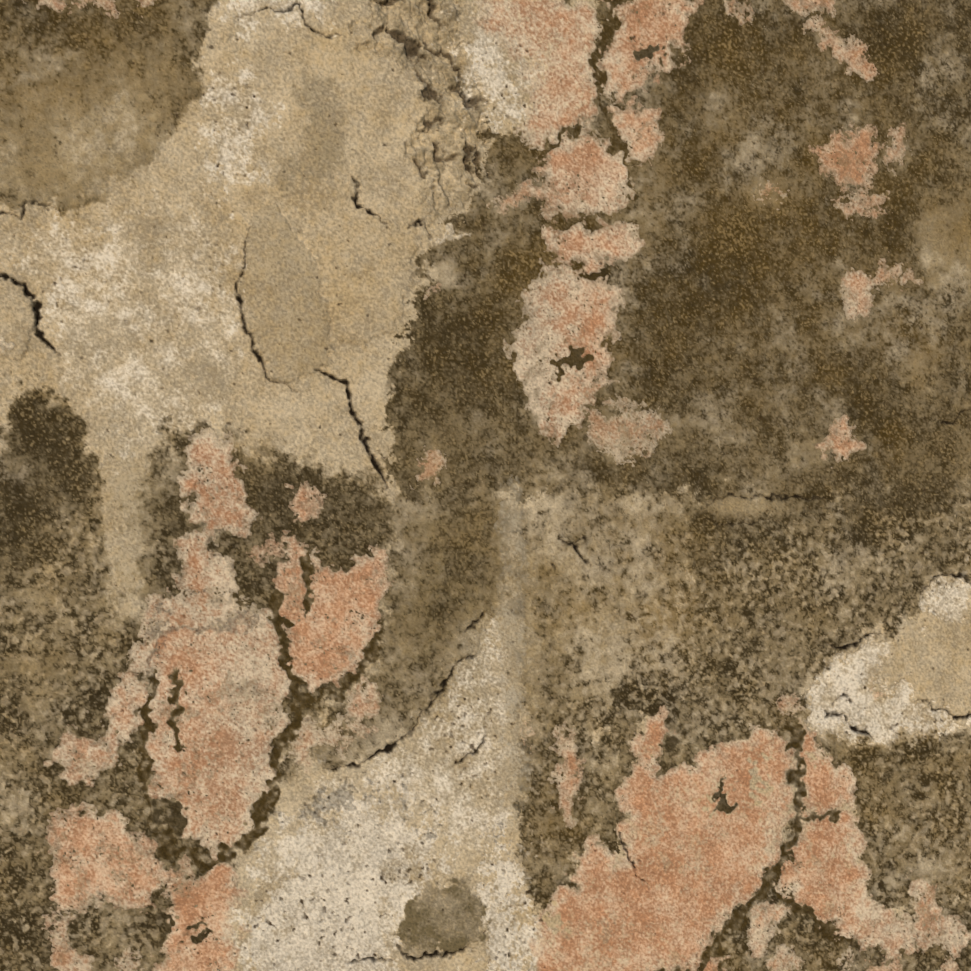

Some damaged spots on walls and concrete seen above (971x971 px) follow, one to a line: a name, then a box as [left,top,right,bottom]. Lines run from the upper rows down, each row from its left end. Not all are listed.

crack [0,272,61,356]
crack [0,200,62,221]
crack [235,226,298,393]
spalling [0,0,705,467]
crack [313,368,390,489]
crack [703,492,832,528]
damp [0,369,402,971]
crack [326,611,488,771]
spalling [41,427,971,971]